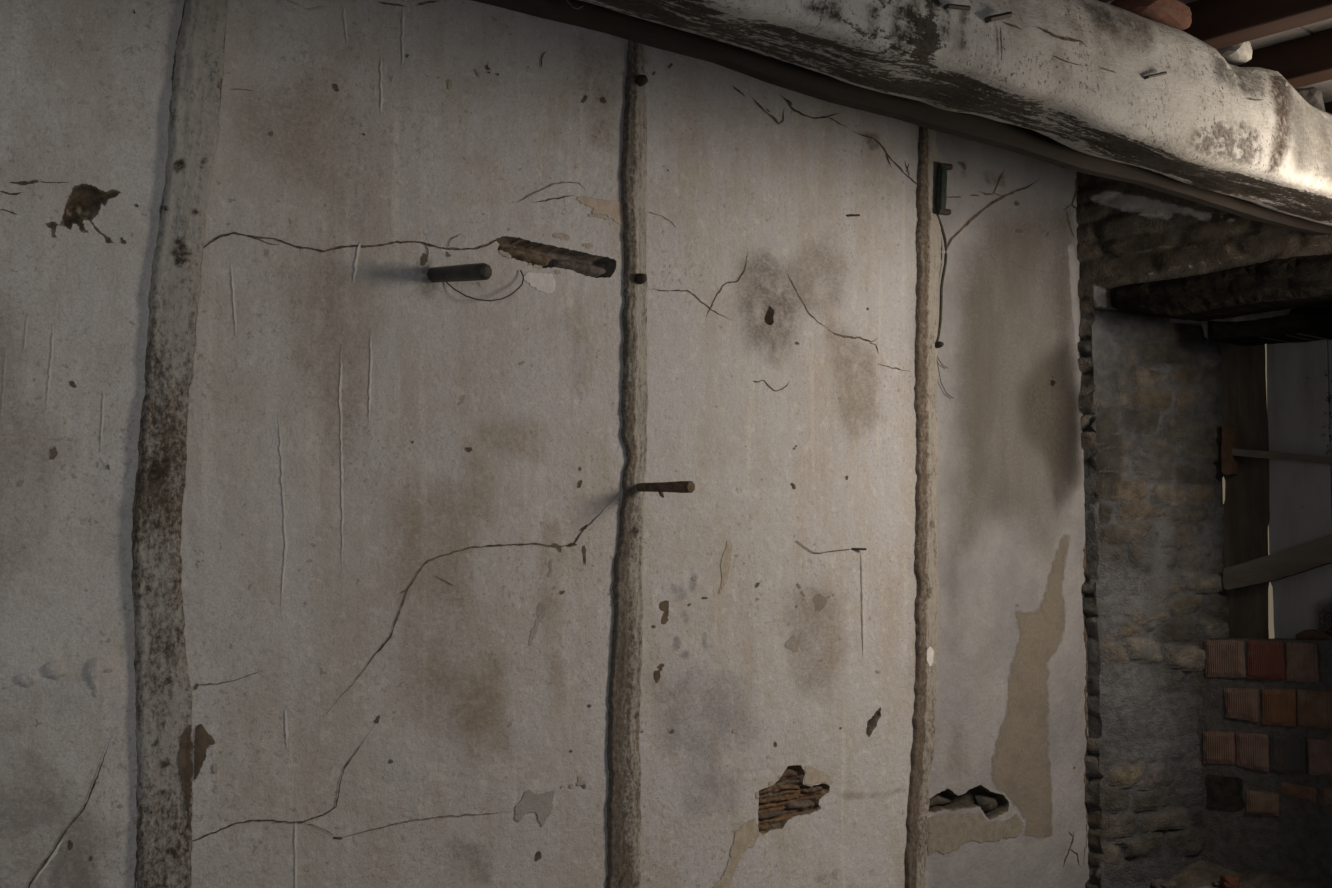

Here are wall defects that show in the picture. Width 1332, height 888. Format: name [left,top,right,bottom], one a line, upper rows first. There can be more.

damp [1217,57,1265,94]
damp [1289,97,1332,178]
flaking render [45,183,127,244]
crack [202,232,497,262]
crack [786,271,908,371]
crack [327,496,616,713]
crack [195,670,264,687]
crack [28,737,112,888]
crack [192,731,511,841]
flaking render [713,765,833,888]
flaking render [928,785,1024,855]